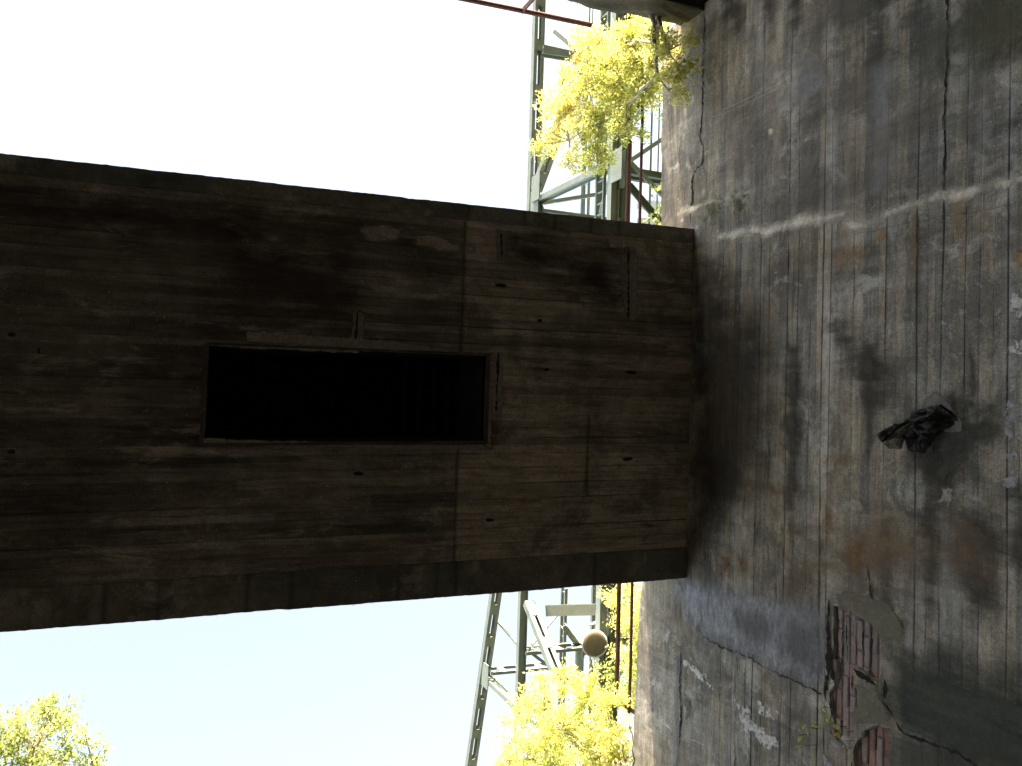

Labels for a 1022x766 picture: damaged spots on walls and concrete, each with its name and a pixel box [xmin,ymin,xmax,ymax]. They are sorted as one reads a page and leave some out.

crack [690,7,707,224]
crack [853,0,1020,334]
crack [676,653,684,747]
crack [681,588,821,766]
spalling [820,601,890,766]
crack [883,703,978,766]